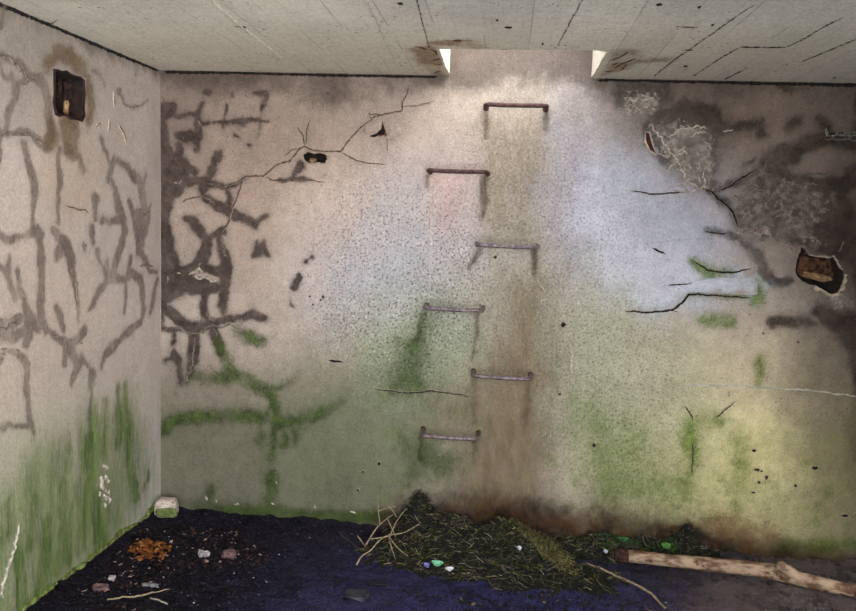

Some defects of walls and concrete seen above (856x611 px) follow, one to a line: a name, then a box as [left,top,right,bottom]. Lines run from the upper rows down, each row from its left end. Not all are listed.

crack [596,4,856,88]
rust [45,47,95,158]
crack [0,2,437,233]
leakage [0,52,270,435]
crack [632,189,681,197]
crack [624,262,752,314]
crack [703,169,755,235]
leakage [615,82,856,278]
leakage [752,267,792,305]
leakage [766,317,797,329]
spalling [795,246,848,298]
leakage [0,383,149,609]